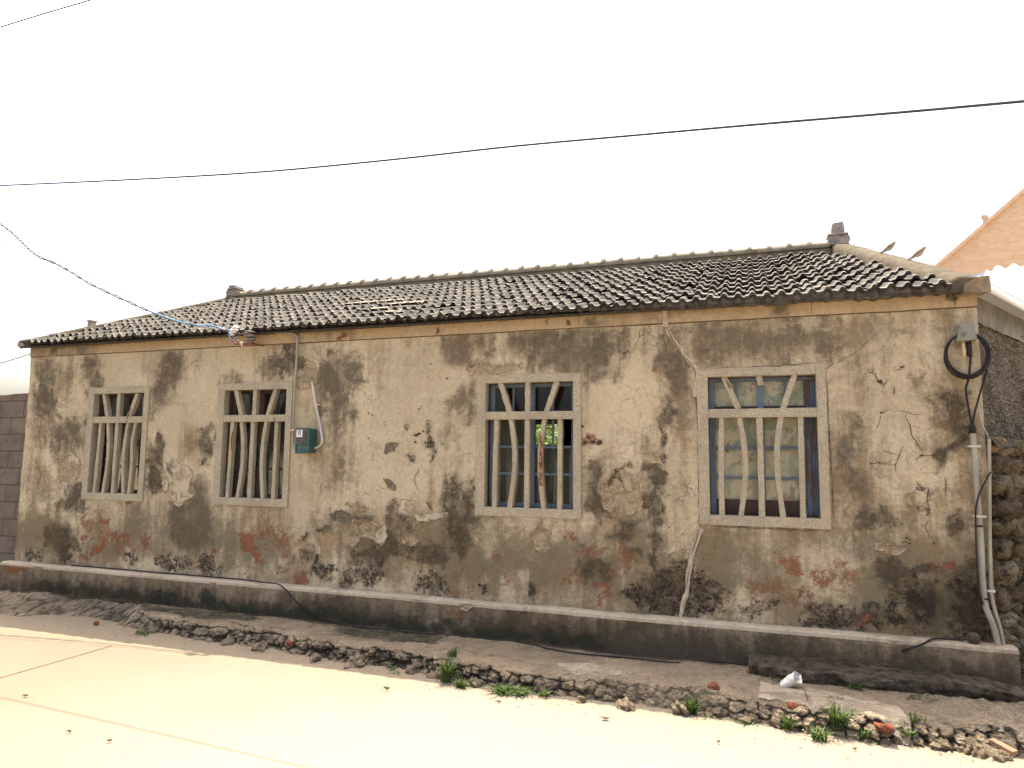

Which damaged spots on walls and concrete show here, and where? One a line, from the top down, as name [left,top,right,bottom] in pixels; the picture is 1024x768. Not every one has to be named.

water stain [34,347,58,418]
water stain [511,317,624,384]
flaking render [162,457,193,507]
flaking render [581,425,602,446]
water stain [584,305,841,618]
crack [679,328,931,648]
water stain [933,391,971,467]
water stain [154,480,221,576]
flaking render [239,500,388,585]
water stain [309,476,497,596]
flaking render [401,512,448,547]
flaking render [747,552,859,614]